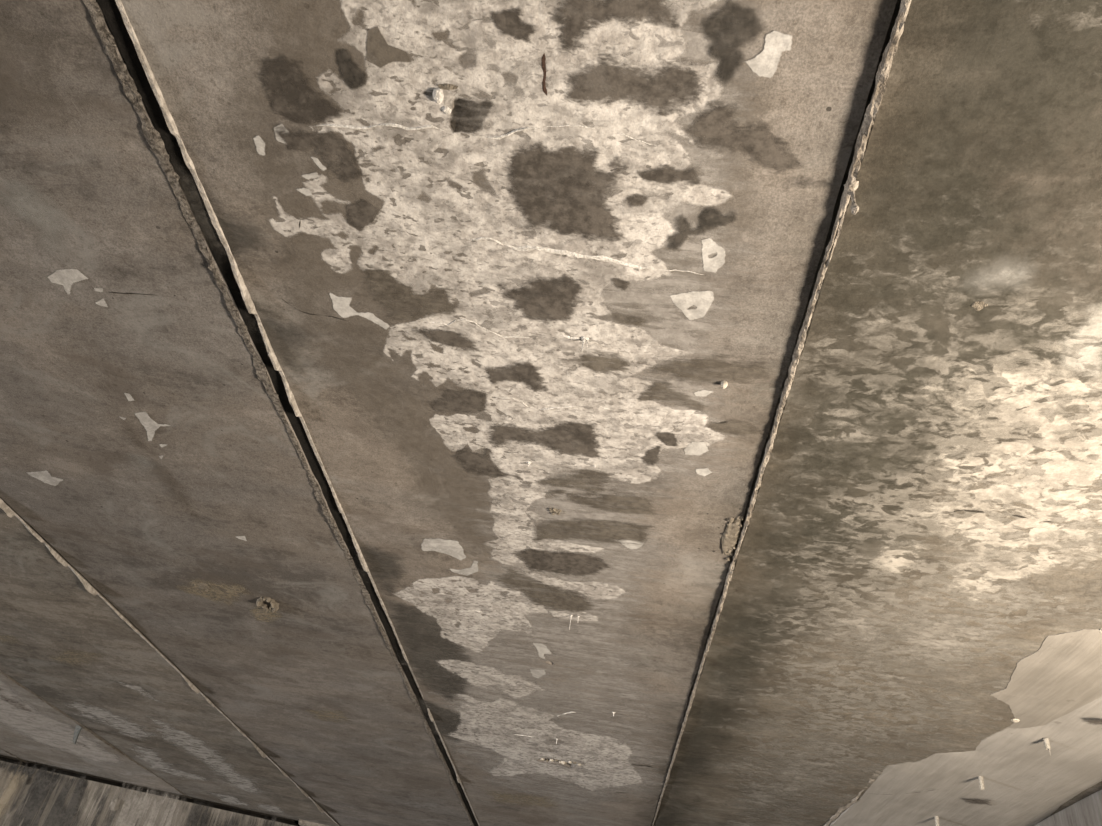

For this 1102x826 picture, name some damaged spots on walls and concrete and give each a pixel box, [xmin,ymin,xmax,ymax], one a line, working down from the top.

peeling [745,31,792,78]
spalling [433,83,458,115]
peeling [702,238,726,272]
peeling [48,269,108,307]
peeling [670,291,714,320]
peeling [119,393,171,459]
leakage [253,0,800,803]
leakage [672,0,1102,826]
peeling [26,470,63,486]
leakage [0,771,277,826]